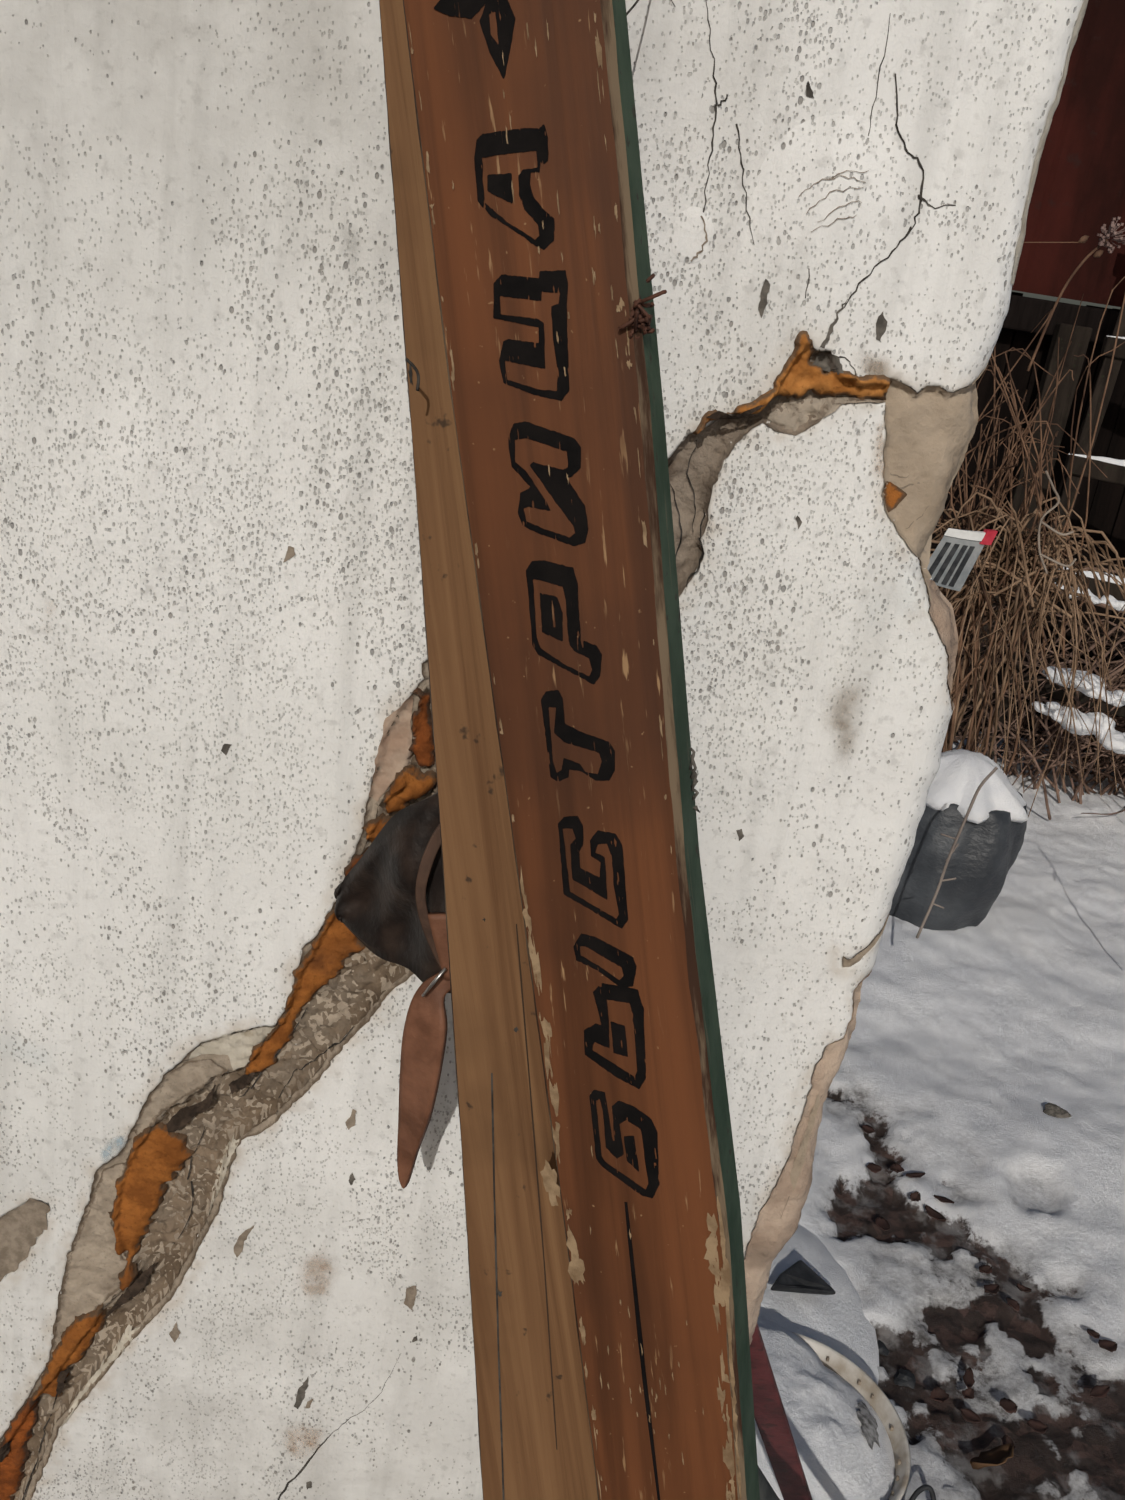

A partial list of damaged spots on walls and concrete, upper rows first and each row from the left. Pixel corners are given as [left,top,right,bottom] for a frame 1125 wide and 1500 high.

peeling [592,268,632,370]
crack [668,0,956,596]
spalling [882,364,988,710]
crack [0,659,438,1500]
spalling [345,1109,357,1130]
spalling [0,1198,50,1282]
spalling [234,1225,254,1257]
spalling [703,914,889,1500]
spalling [169,1322,181,1343]
spalling [294,1377,313,1409]
spalling [404,1286,417,1311]
peeling [579,1317,609,1388]